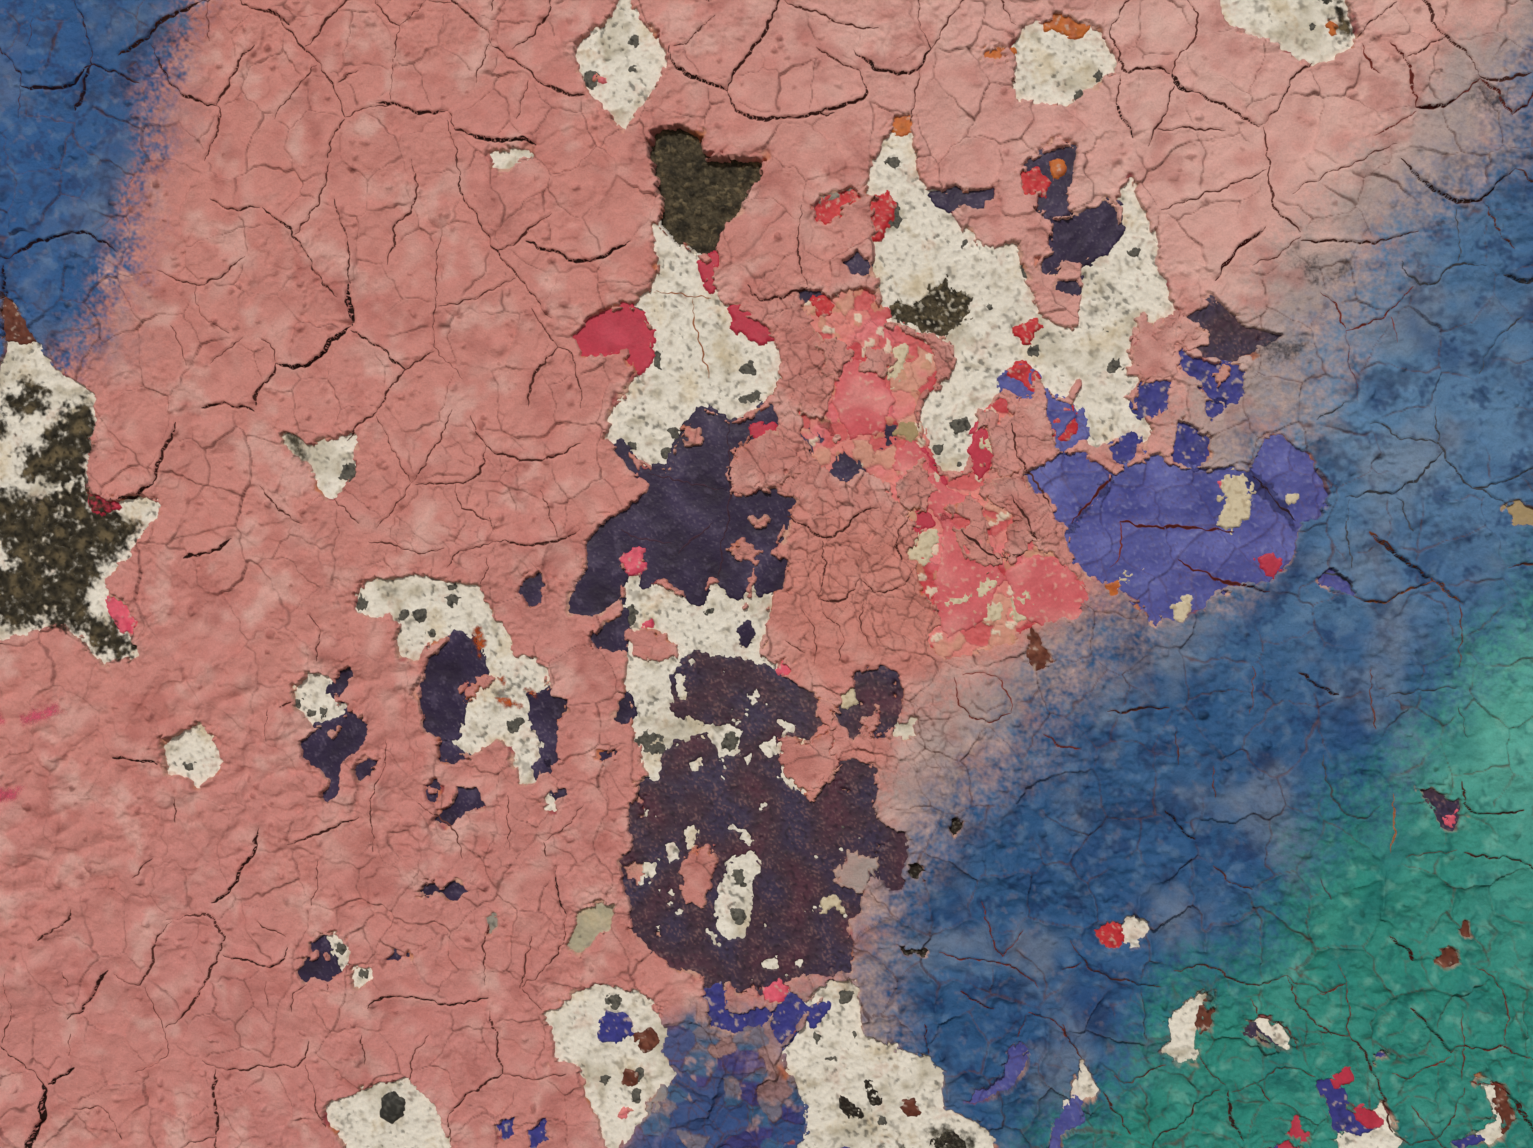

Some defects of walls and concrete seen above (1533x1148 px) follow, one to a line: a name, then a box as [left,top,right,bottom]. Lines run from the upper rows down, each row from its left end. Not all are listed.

peeling [576,0,667,129]
crack [668,0,964,122]
peeling [0,296,161,664]
crack [0,0,631,584]
peeling [293,667,377,803]
peeling [355,572,568,826]
peeling [567,115,1328,1148]
crack [961,423,1270,592]
crack [1109,0,1533,738]
crack [0,741,387,1148]
peeling [544,984,677,1148]
crack [939,901,1533,1148]